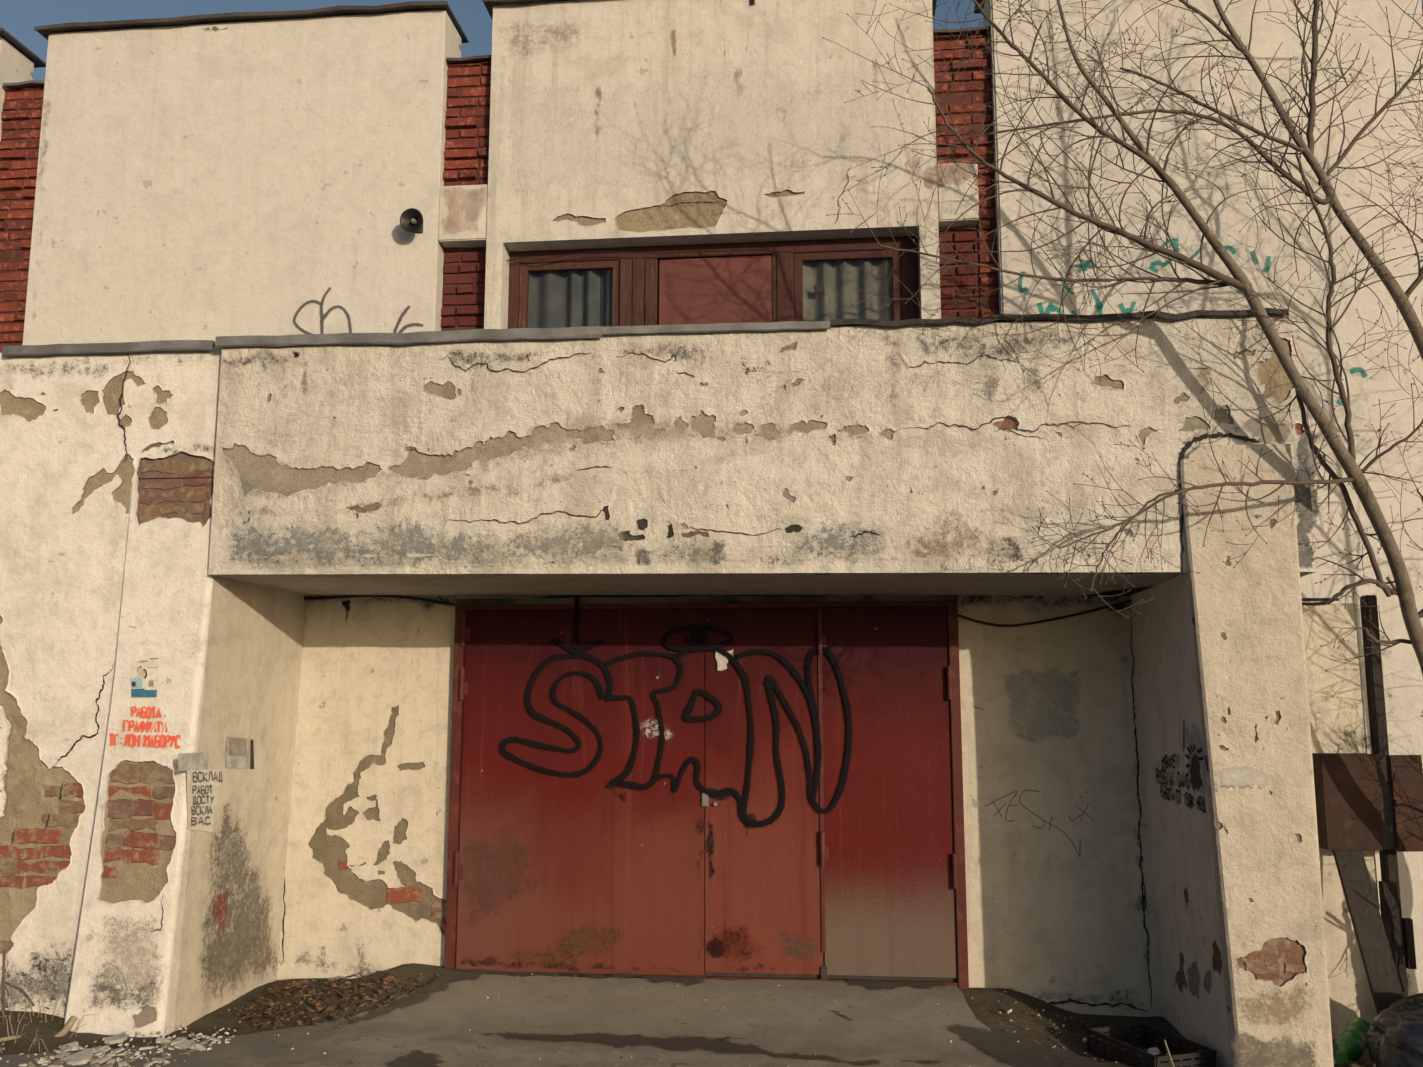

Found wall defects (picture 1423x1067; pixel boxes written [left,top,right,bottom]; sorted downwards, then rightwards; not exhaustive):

flaking render [551,190,728,233]
crack [117,355,131,462]
flaking render [71,370,896,529]
crack [442,352,695,377]
leakage [229,509,725,567]
leakage [769,524,879,565]
leakage [906,515,1041,565]
crack [55,663,115,765]
flaking render [0,611,179,955]
flaking render [308,704,446,937]
crack [1049,604,1152,1012]
flaking render [1173,936,1309,1000]